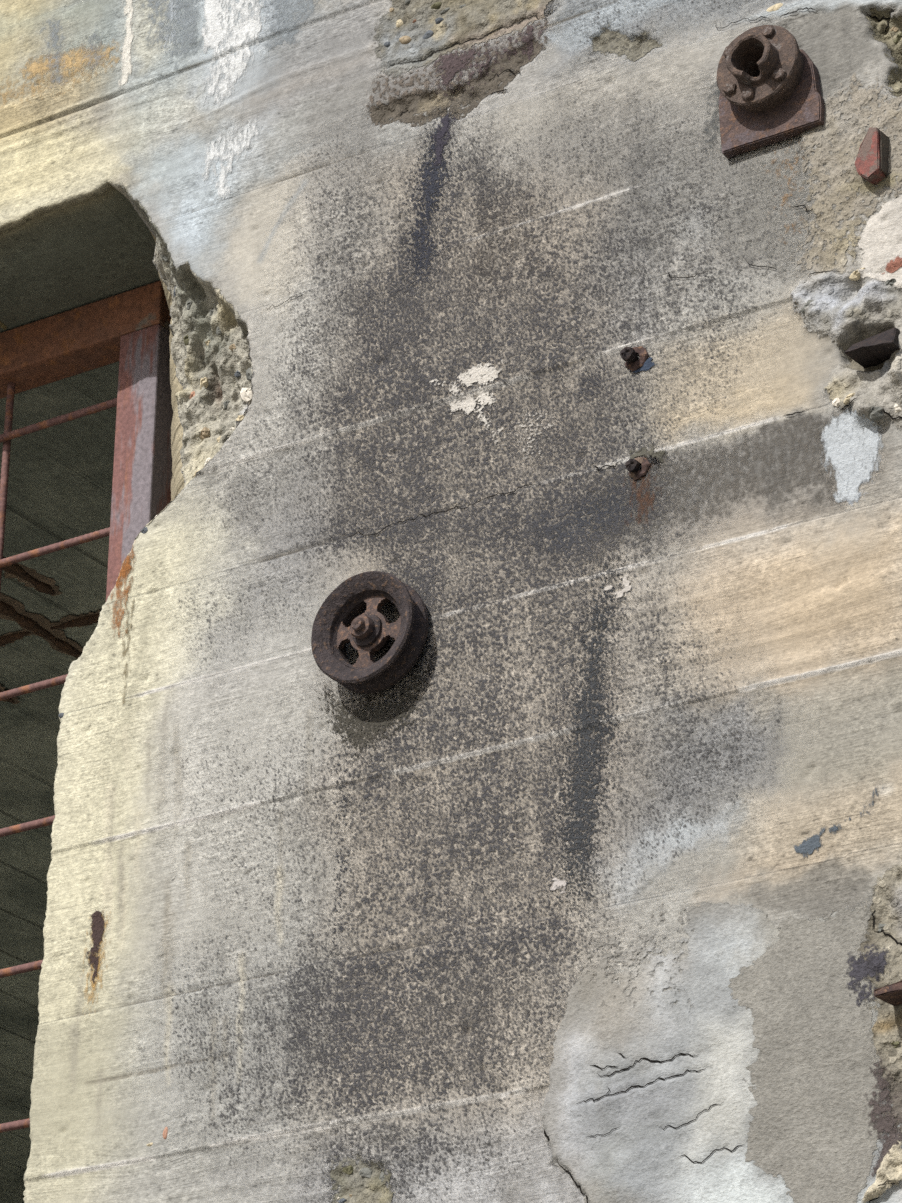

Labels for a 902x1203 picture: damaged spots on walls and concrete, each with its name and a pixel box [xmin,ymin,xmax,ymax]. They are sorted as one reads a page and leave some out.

leakage [119,0,315,104]
spalling [366,0,551,127]
spalling [114,182,253,490]
leakage [154,93,883,1203]
rust [86,911,107,1002]
crack [575,1053,706,1105]
spalling [858,856,902,1203]
spalling [330,1154,394,1203]
crack [544,1130,588,1203]
crack [662,1104,747,1163]